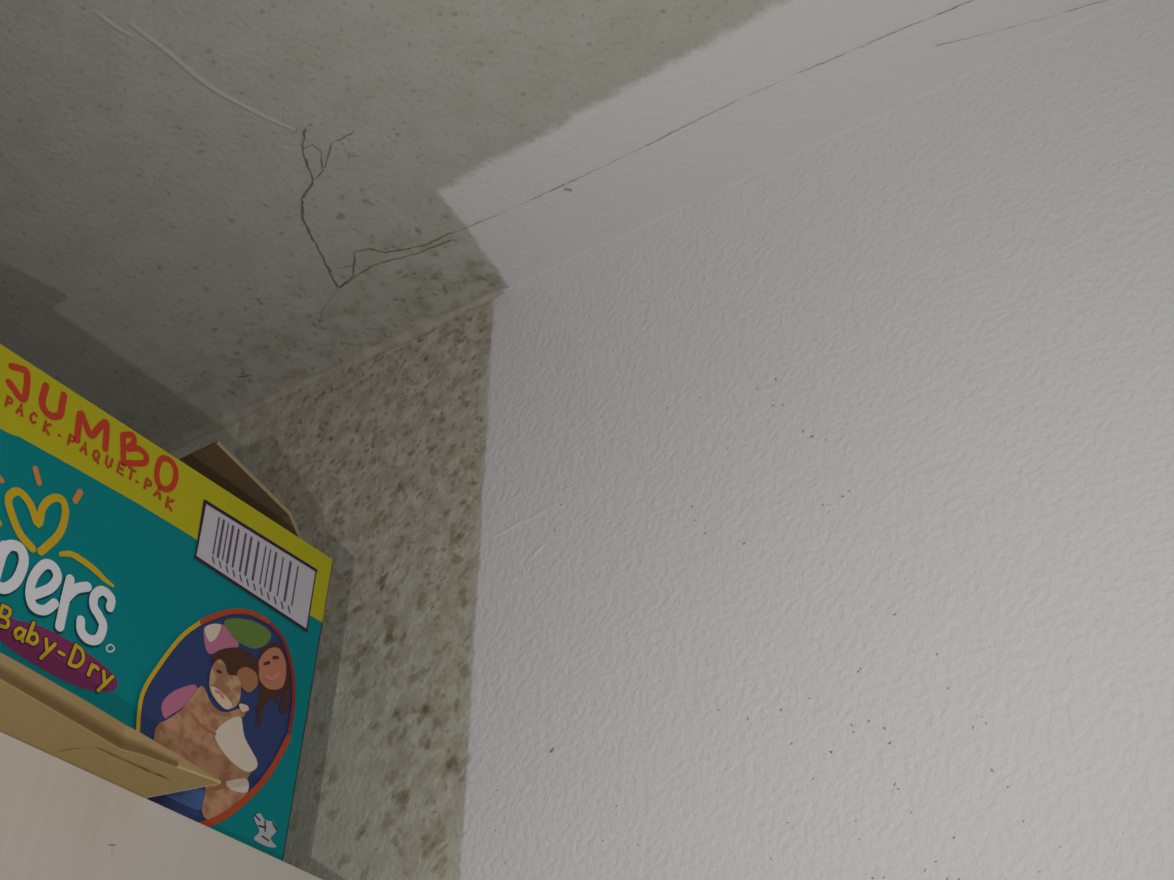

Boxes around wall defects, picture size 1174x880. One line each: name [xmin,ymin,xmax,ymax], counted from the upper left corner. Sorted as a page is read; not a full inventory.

crack [301,129,494,287]